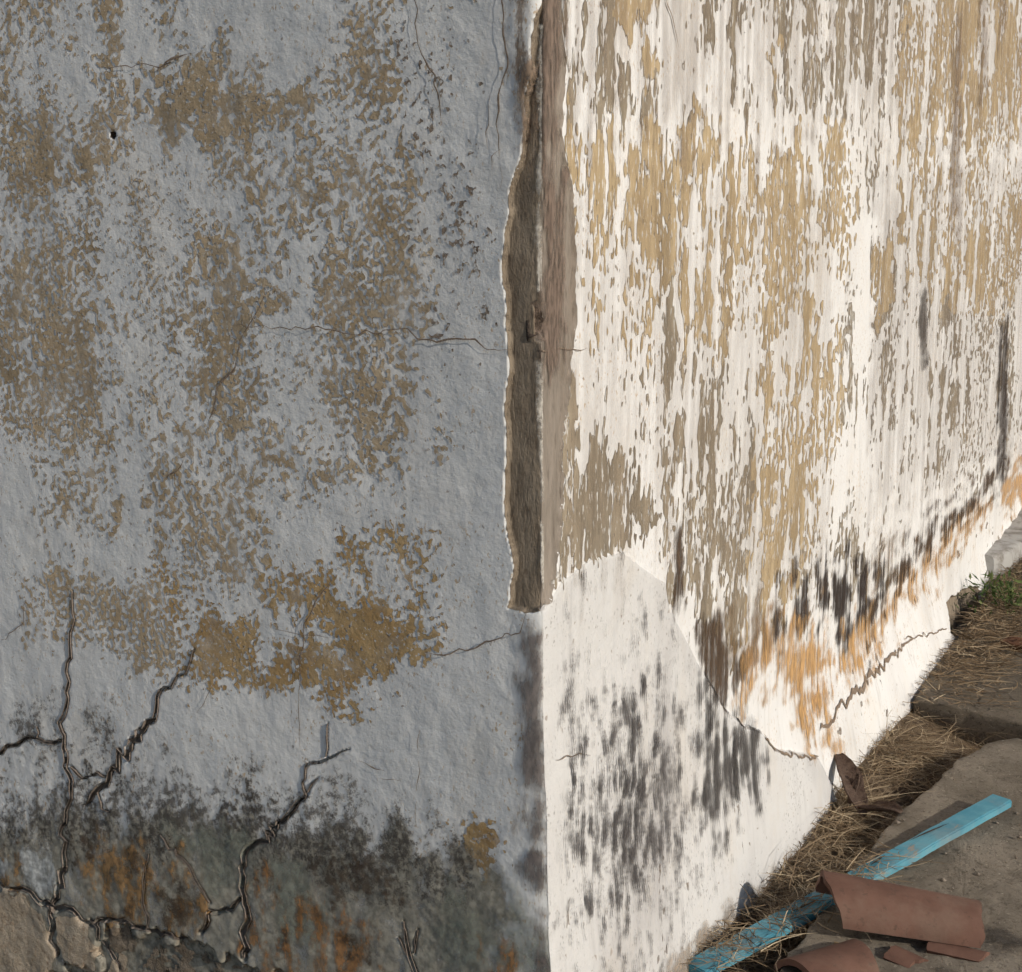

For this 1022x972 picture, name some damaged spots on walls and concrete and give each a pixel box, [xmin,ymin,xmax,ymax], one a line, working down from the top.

peeling [0,0,1022,726]
water stain [920,289,929,368]
spalling [0,886,253,972]
crack [0,579,420,972]
water stain [0,687,550,972]
crack [424,612,527,656]
water stain [512,630,547,893]
water stain [559,319,1022,972]
crack [765,735,819,760]
crack [820,628,947,730]